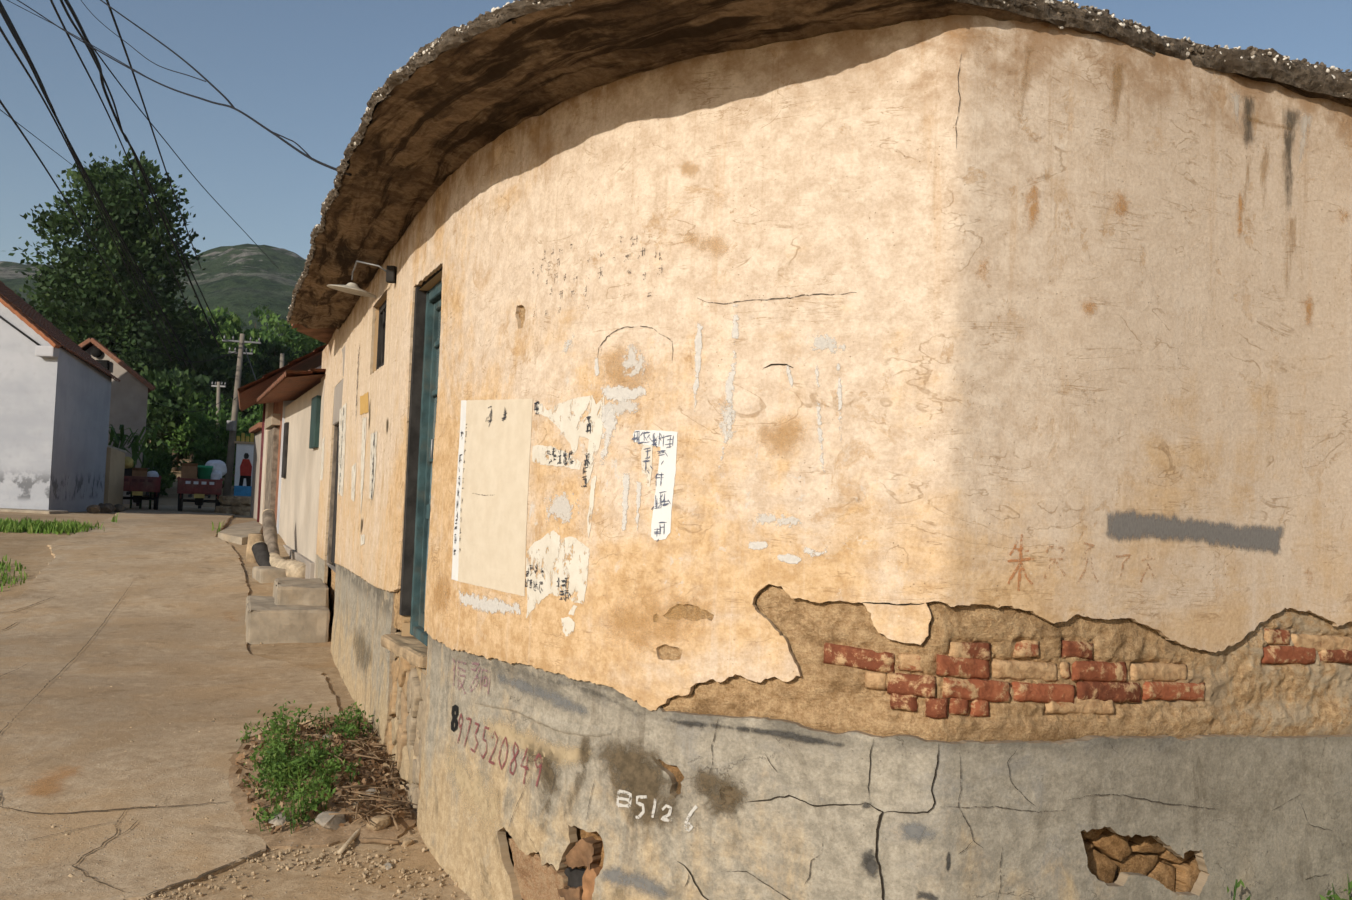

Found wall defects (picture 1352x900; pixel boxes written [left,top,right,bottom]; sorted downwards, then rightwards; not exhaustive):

damp [1234,96,1252,141]
damp [1285,111,1310,192]
crack [1,585,131,712]
flaking render [655,584,1352,742]
crack [0,796,268,895]
crack [677,861,709,900]
crack [727,843,823,900]
crack [748,739,1215,900]